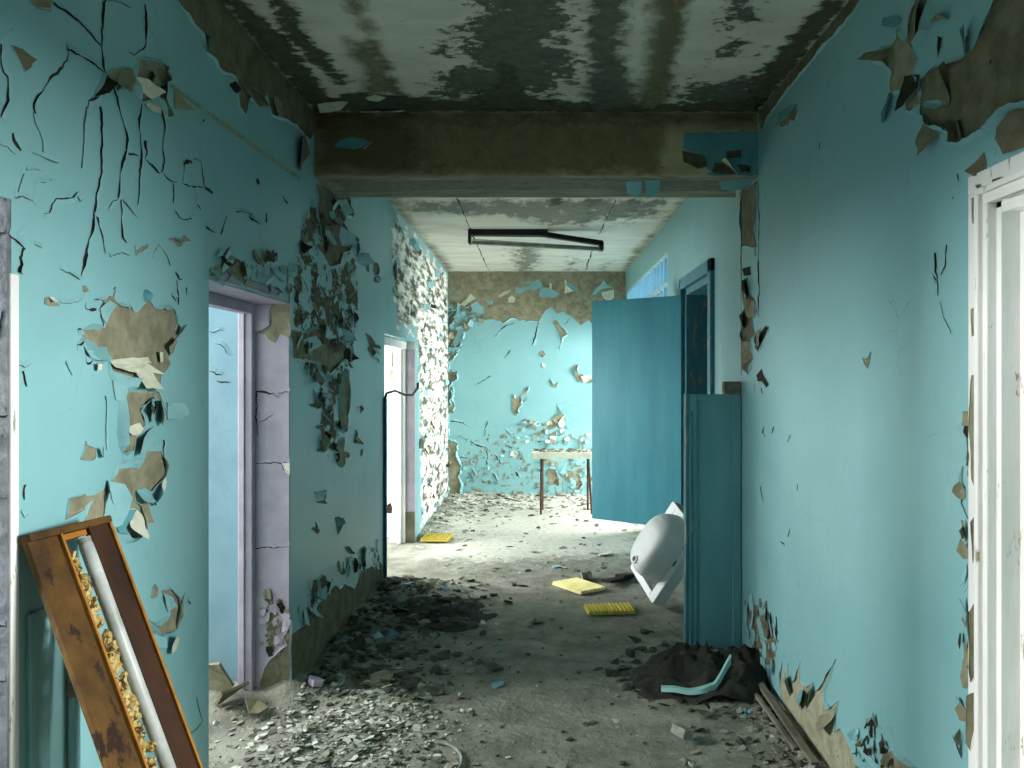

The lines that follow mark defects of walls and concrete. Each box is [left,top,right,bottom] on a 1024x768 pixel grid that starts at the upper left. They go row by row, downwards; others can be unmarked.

crack [0,407,8,418]
crack [0,484,29,518]
peeling [65,285,189,543]
crack [0,0,288,387]
crack [255,386,292,473]
peeling [210,182,626,528]
water stain [515,247,540,271]
water stain [212,0,844,226]
peeling [857,0,1024,224]
spalling [257,539,383,688]
peeling [743,593,918,768]
peeling [952,518,974,759]